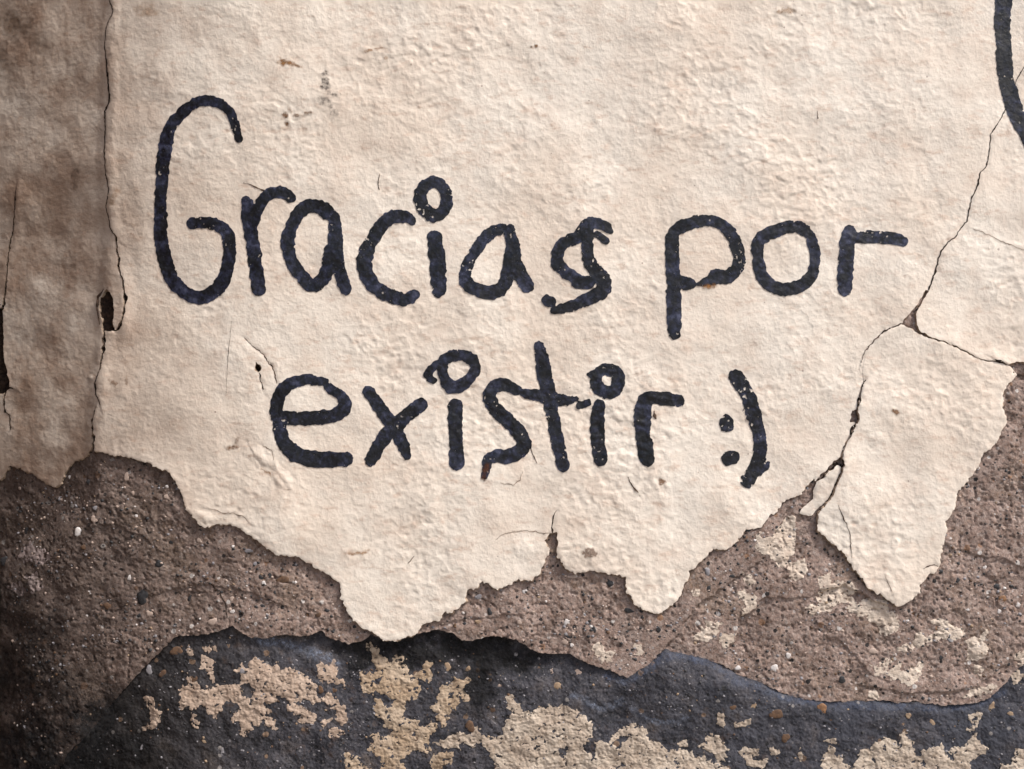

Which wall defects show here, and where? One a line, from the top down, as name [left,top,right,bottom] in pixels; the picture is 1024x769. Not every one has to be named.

crack [90,1,128,453]
crack [928,109,1022,290]
spalling [0,420,780,769]
spalling [417,298,1024,769]
crack [816,323,929,554]